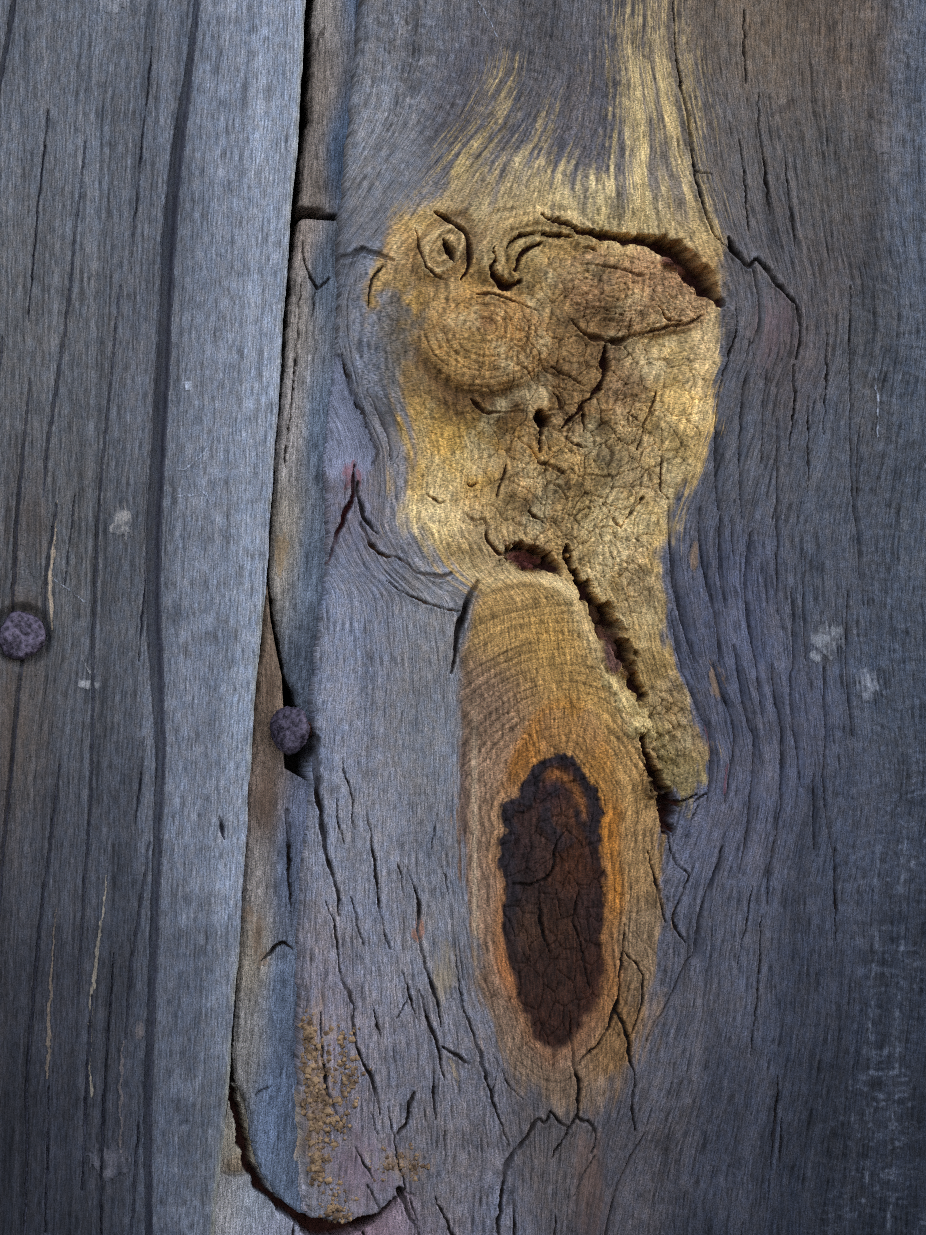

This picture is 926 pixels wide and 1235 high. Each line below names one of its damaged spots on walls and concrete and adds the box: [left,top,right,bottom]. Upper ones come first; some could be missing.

crack [0,337,8,364]
crack [0,660,24,900]
crack [11,0,199,1235]
crack [261,2,863,1235]